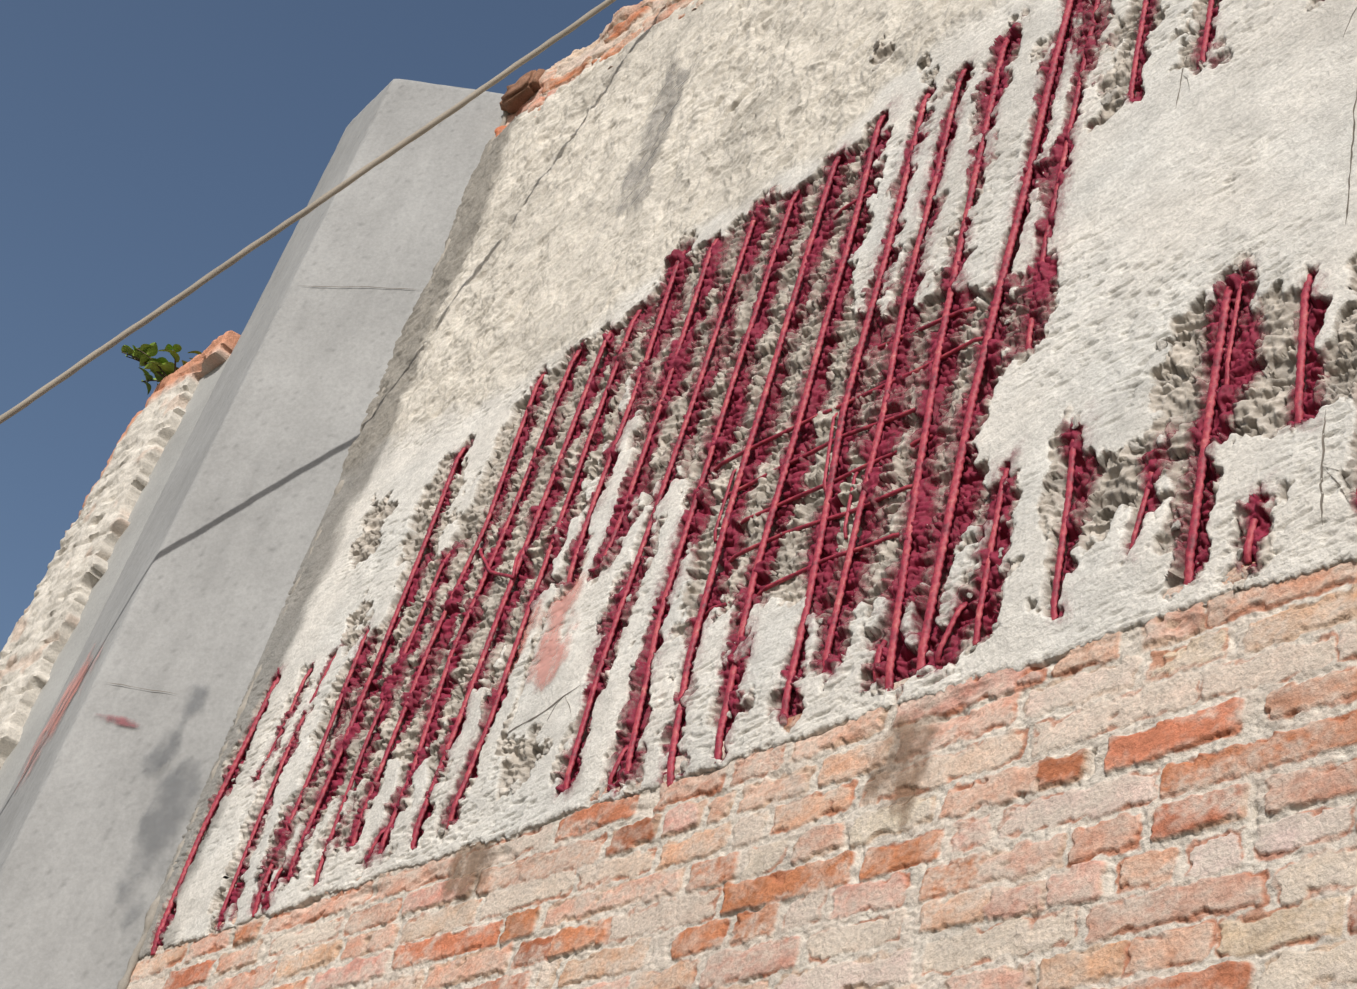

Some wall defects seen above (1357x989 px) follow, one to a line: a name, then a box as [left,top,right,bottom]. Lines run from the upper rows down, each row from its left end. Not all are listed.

spalling [1305,0,1325,12]
crack [1345,91,1357,224]
rust [208,0,1112,930]
spalling [149,0,1233,956]
spalling [1028,252,1357,620]
rust [1127,261,1264,582]
rust [1241,489,1274,571]
rust [1287,270,1330,427]
rust [152,899,177,946]